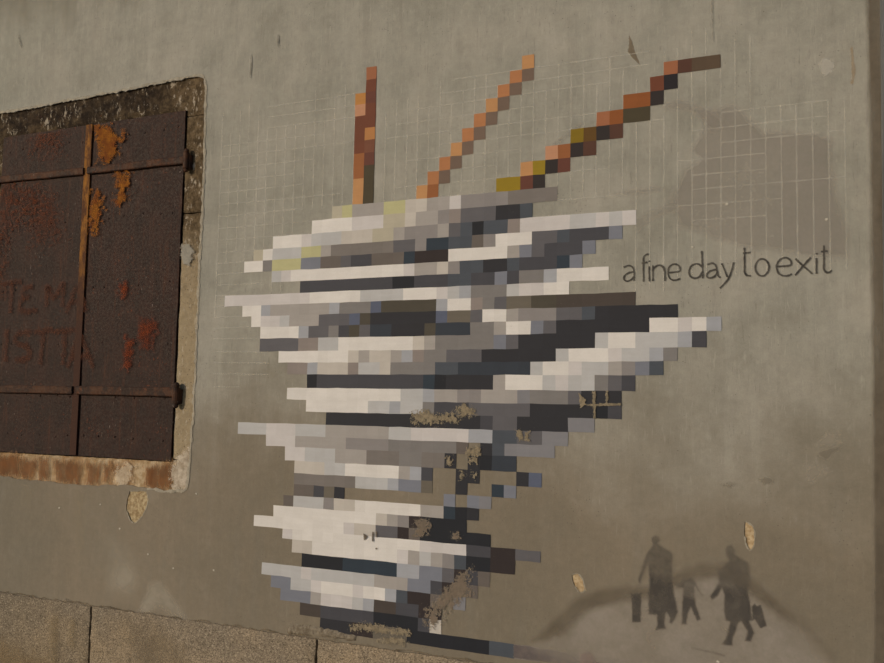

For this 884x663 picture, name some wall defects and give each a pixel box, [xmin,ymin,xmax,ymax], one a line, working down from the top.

corrosion [87,122,135,237]
peeling [409,401,478,429]
peeling [578,391,621,419]
corrosion [0,454,120,485]
corrosion [144,464,173,490]
peeling [444,444,482,481]
spalling [127,490,148,524]
spalling [744,521,756,551]
peeling [423,564,478,629]
spalling [572,573,586,593]